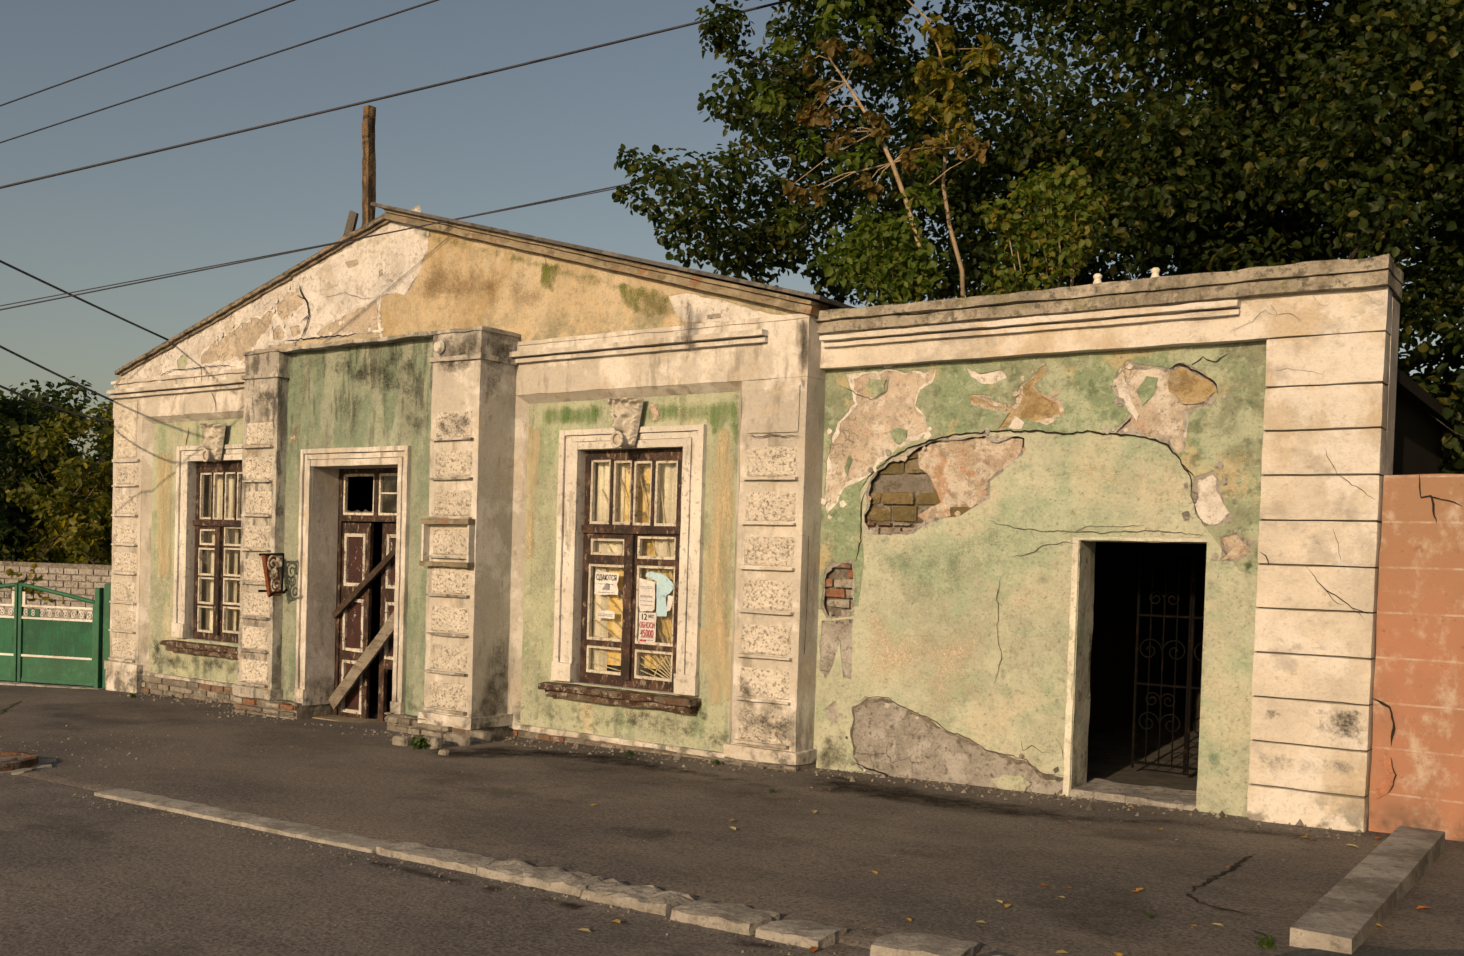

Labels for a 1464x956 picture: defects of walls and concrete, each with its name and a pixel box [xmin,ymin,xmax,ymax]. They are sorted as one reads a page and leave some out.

peeling [119,205,430,380]
water stain [534,264,557,296]
water stain [620,284,668,314]
water stain [336,354,412,388]
spalling [821,363,1064,536]
spalling [1103,355,1226,453]
crack [1419,475,1462,524]
spalling [820,560,855,680]
crack [1309,530,1368,618]
spalling [826,698,1063,795]
crack [1373,698,1397,794]